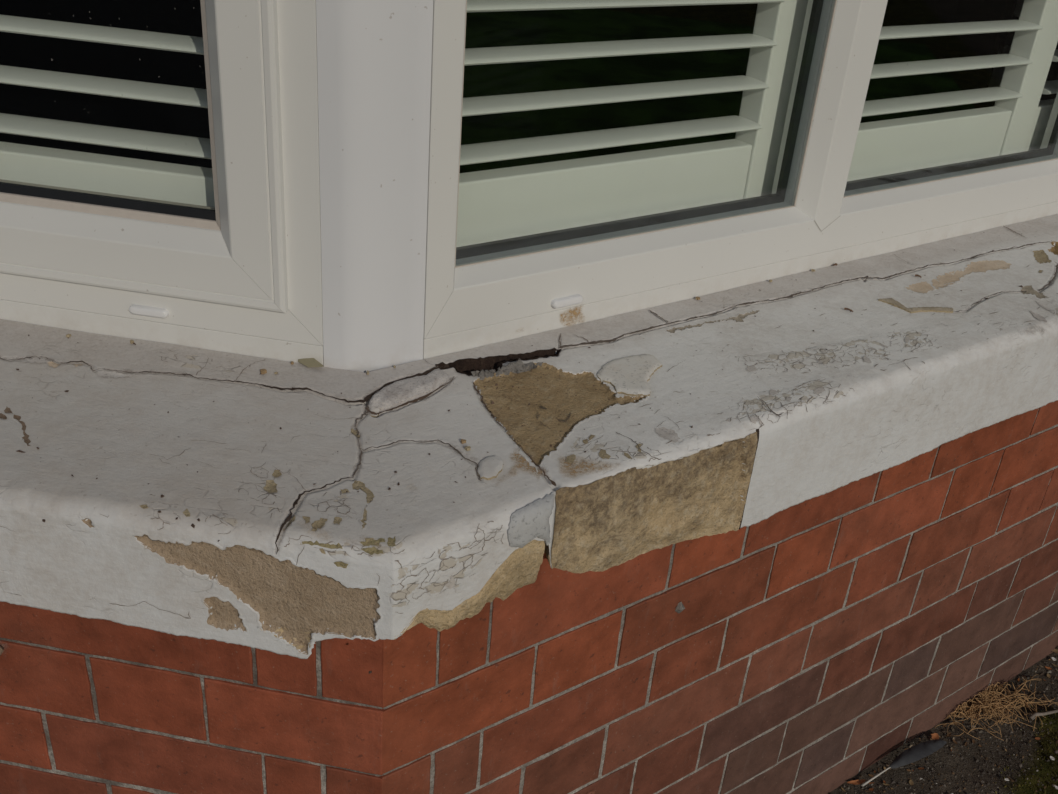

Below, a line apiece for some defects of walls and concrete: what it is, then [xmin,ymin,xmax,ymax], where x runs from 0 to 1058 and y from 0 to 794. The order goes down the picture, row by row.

crack [559,227,1058,436]
peeling [878,298,953,313]
peeling [904,260,1012,294]
peeling [1020,285,1053,322]
peeling [1032,241,1058,273]
flaking render [471,354,662,469]
peeling [263,470,282,493]
crack [1,351,686,614]
peeling [340,479,396,555]
spalling [395,427,759,639]
flaking render [133,516,383,656]